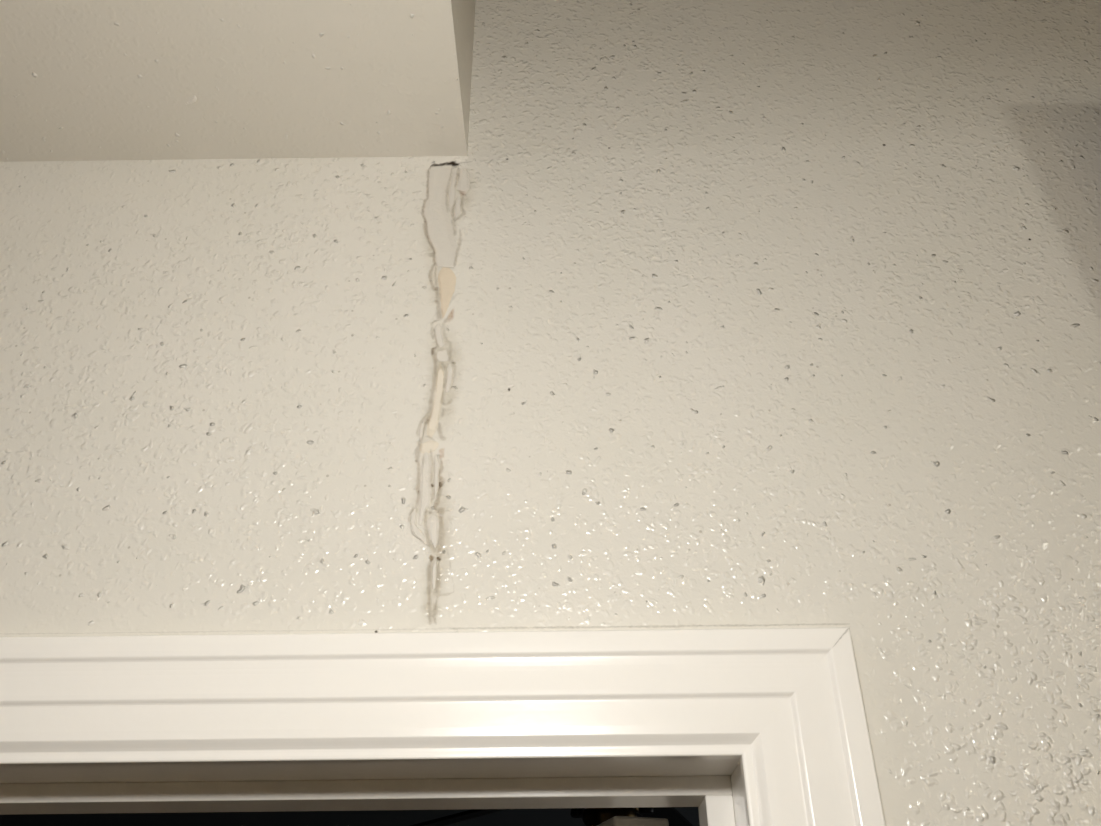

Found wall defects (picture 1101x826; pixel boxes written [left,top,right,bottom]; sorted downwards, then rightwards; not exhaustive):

crack [432,159,458,167]
peeling [418,167,470,590]